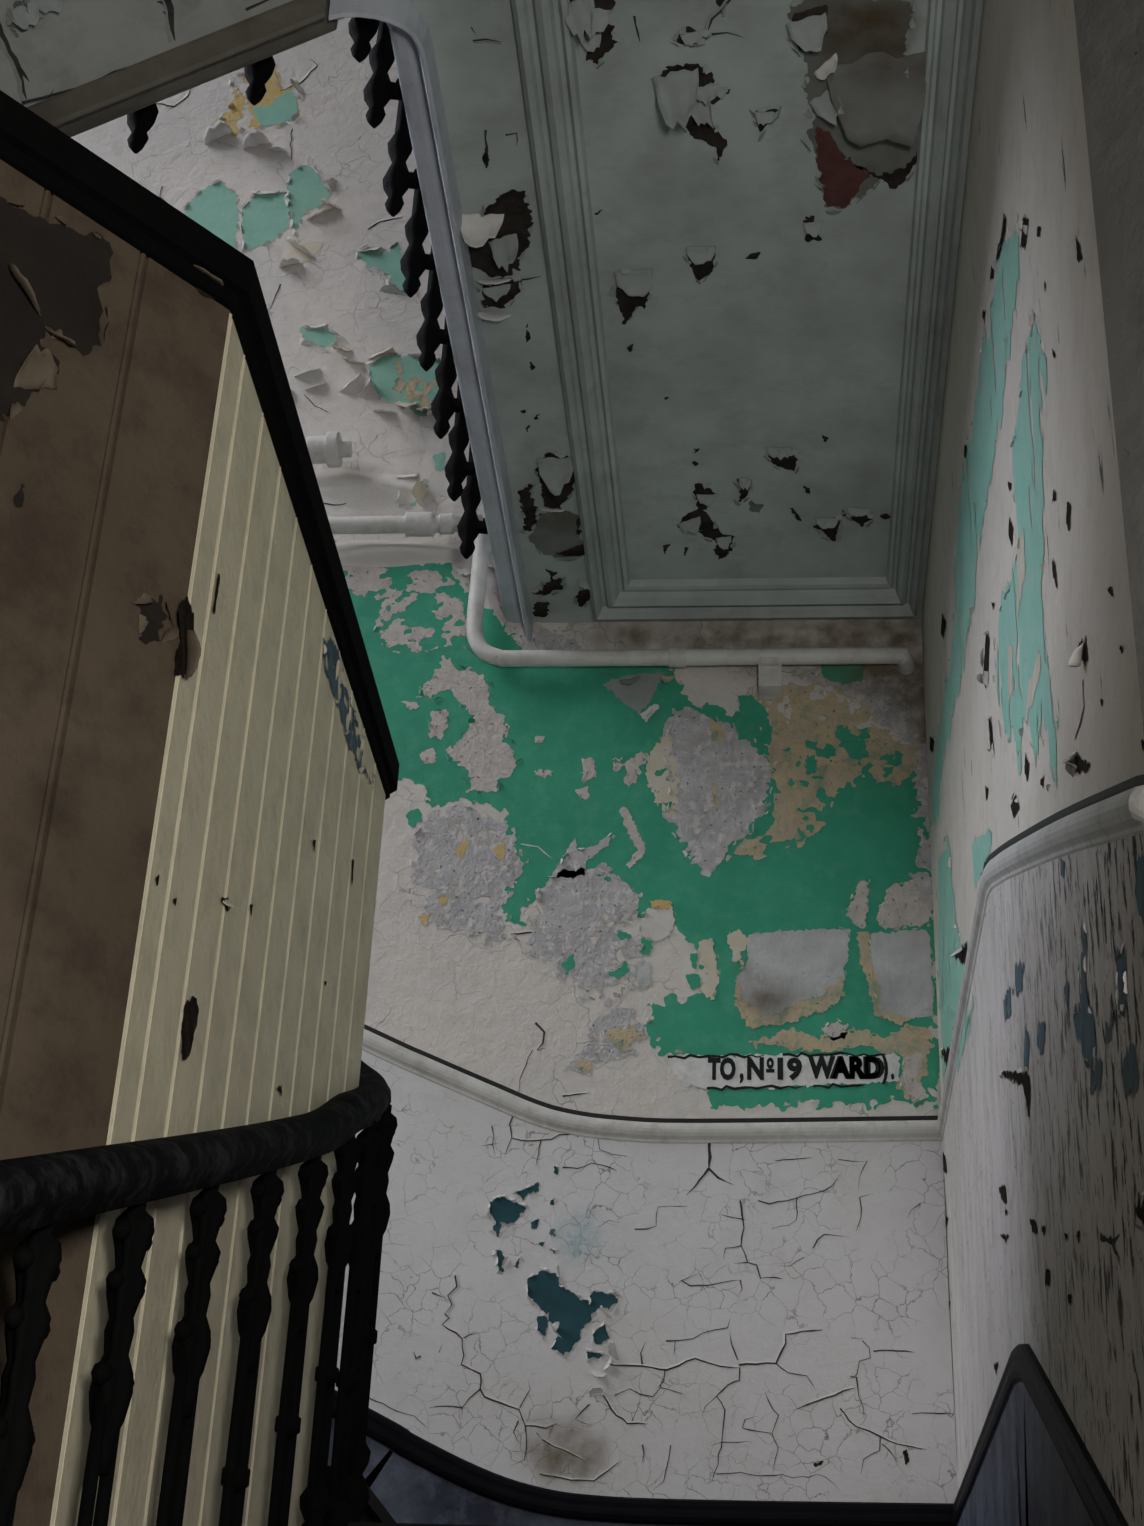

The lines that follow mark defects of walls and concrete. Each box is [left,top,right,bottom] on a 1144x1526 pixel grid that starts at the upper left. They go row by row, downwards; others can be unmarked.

peeling [6,0,65,38]
peeling [204,66,305,152]
peeling [565,0,623,69]
peeling [652,26,730,164]
peeling [785,0,926,242]
peeling [183,165,341,271]
peeling [460,189,534,342]
peeling [291,324,441,422]
peeling [342,213,1090,1117]
peeling [1064,921,1144,1099]
peeling [486,1166,621,1394]
crack [370,1143,958,1490]